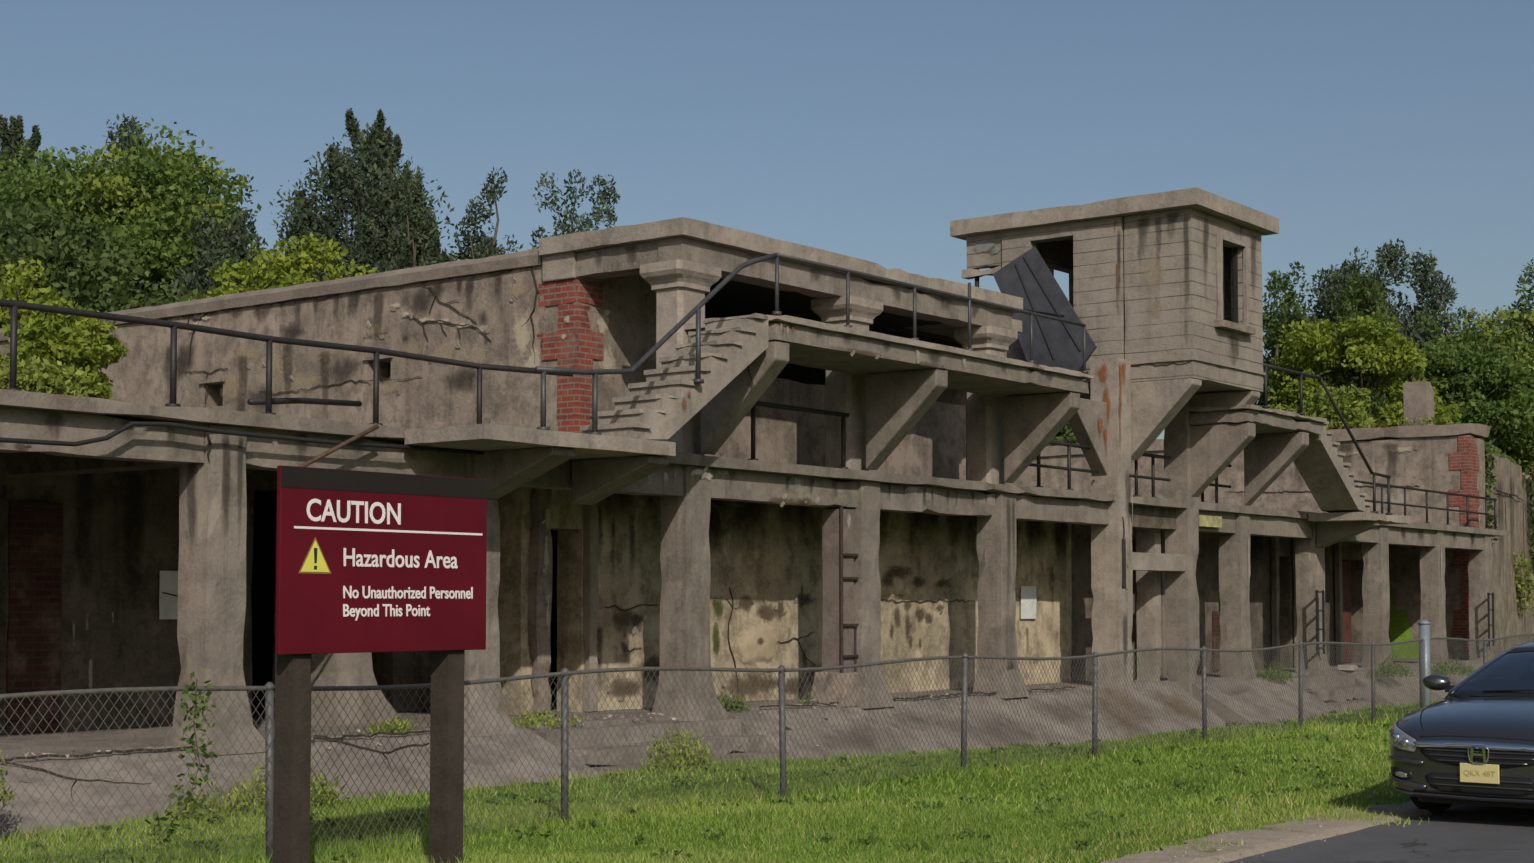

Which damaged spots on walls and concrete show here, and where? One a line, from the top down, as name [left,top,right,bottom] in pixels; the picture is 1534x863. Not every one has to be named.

crack [405,266,541,364]
crack [131,291,358,462]
crack [259,376,420,394]
rust [1098,363,1126,447]
crack [726,587,838,708]
crack [893,686,1076,701]